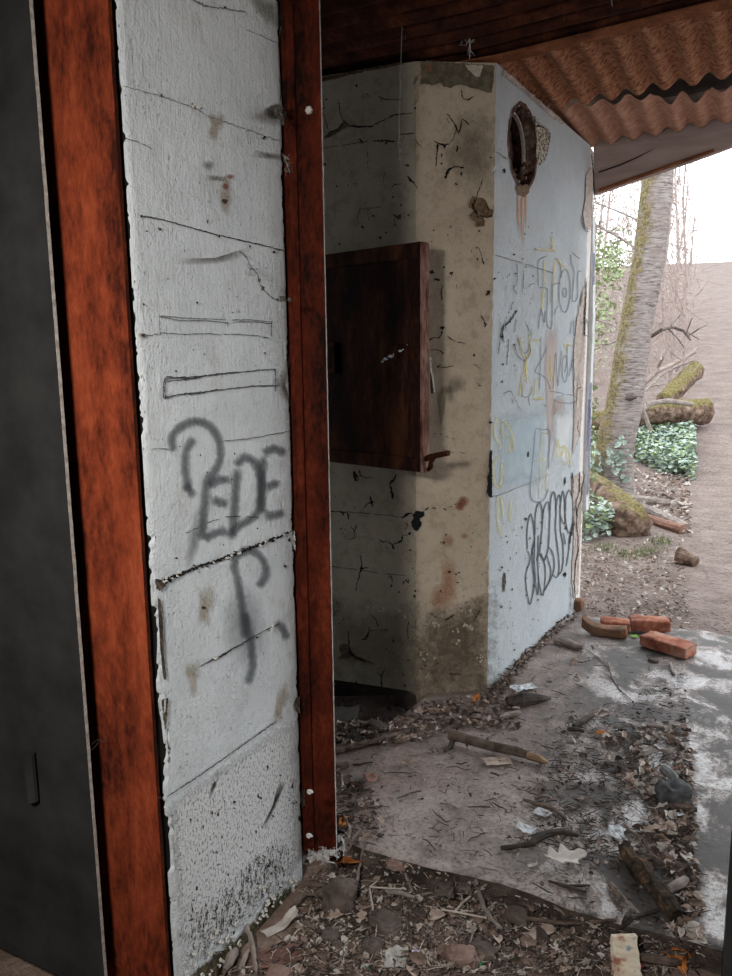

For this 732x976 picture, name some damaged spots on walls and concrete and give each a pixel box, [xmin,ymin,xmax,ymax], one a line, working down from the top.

crack [193,0,277,43]
crack [322,89,474,188]
crack [140,215,284,251]
spalling [469,179,493,232]
rust [516,184,529,238]
crack [157,529,296,588]
crack [330,470,409,589]
crack [200,623,279,667]
water stain [411,599,492,694]
crack [167,721,277,797]